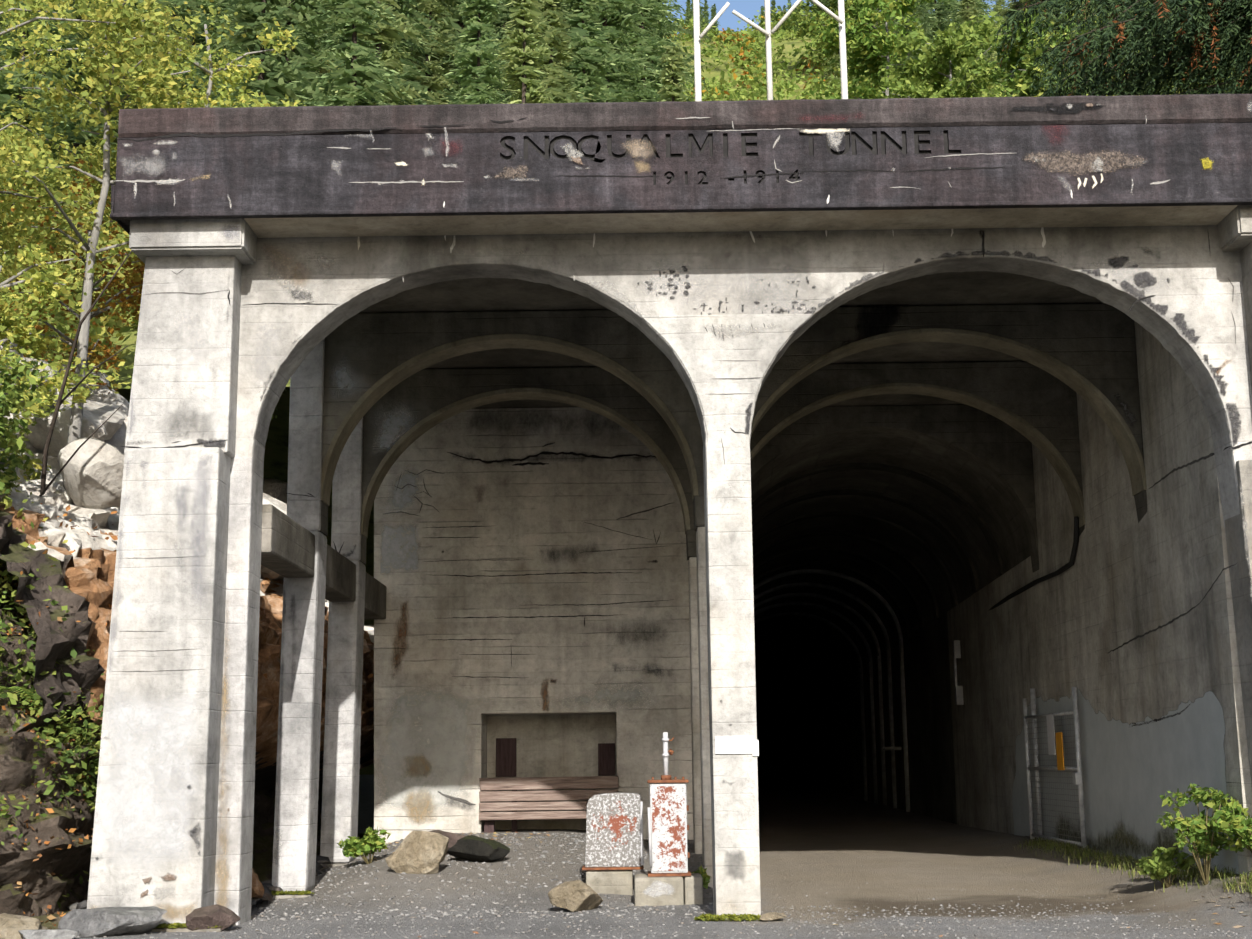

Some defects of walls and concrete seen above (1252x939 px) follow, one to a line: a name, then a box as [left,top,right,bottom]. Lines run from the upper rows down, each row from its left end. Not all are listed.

spalling [1024,151,1144,189]
peeling [914,251,1056,263]
peeling [588,281,644,316]
spalling [638,266,882,340]
peeling [1082,256,1241,445]
crack [1149,441,1252,489]
crack [385,442,674,678]
rust [393,603,407,668]
crack [1107,563,1237,654]